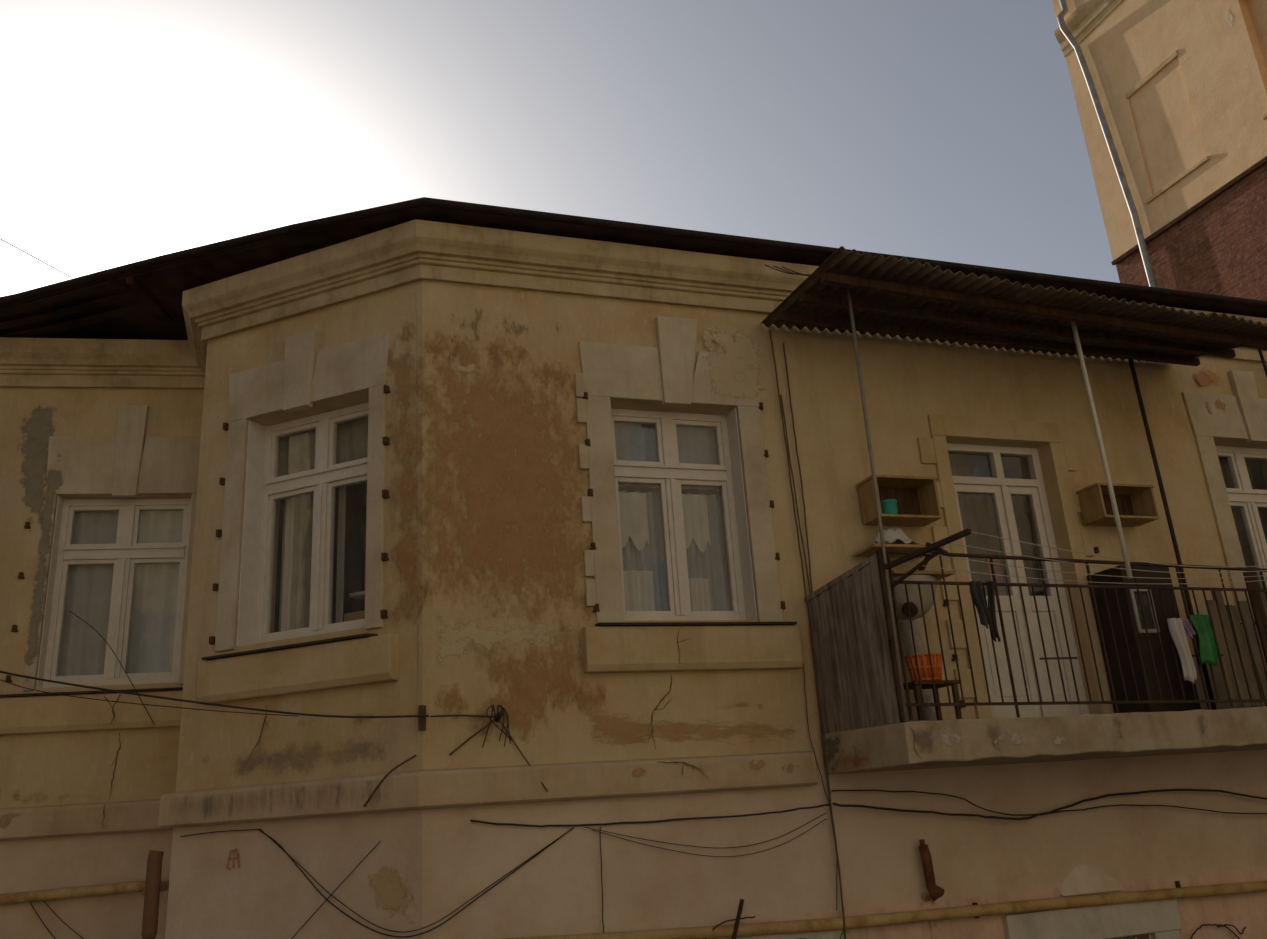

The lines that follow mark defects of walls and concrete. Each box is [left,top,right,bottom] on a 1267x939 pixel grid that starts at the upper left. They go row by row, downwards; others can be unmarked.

peeling [17,407,63,681]
crack [102,694,121,827]
crack [648,629,709,780]
peeling [590,715,792,744]